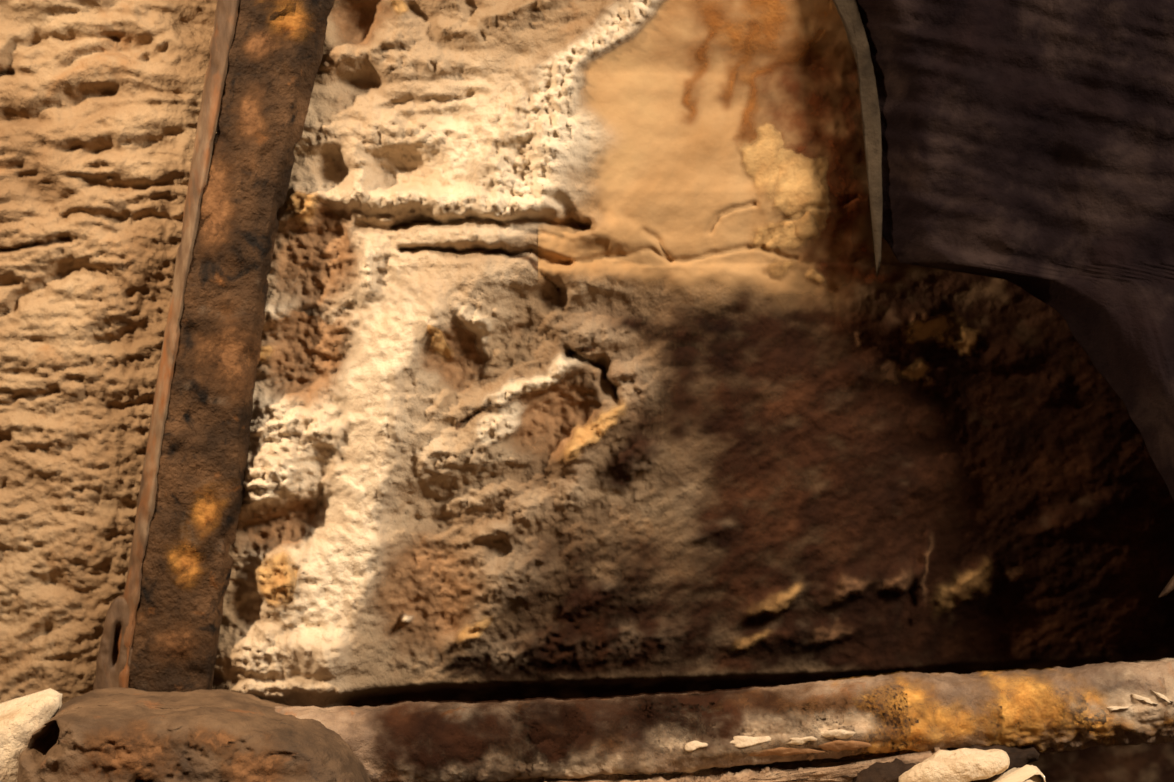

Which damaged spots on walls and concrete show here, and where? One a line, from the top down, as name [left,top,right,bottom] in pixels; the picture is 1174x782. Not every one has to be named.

rust [245,5,305,57]
rust [240,96,265,137]
rust [200,161,234,245]
crack [393,221,559,291]
rust [198,306,261,390]
water stain [602,317,739,489]
rust [193,493,221,528]
rust [169,542,199,582]
rust [157,628,194,658]
water stain [447,603,638,681]
rust [572,735,621,758]
rust [735,673,1134,754]